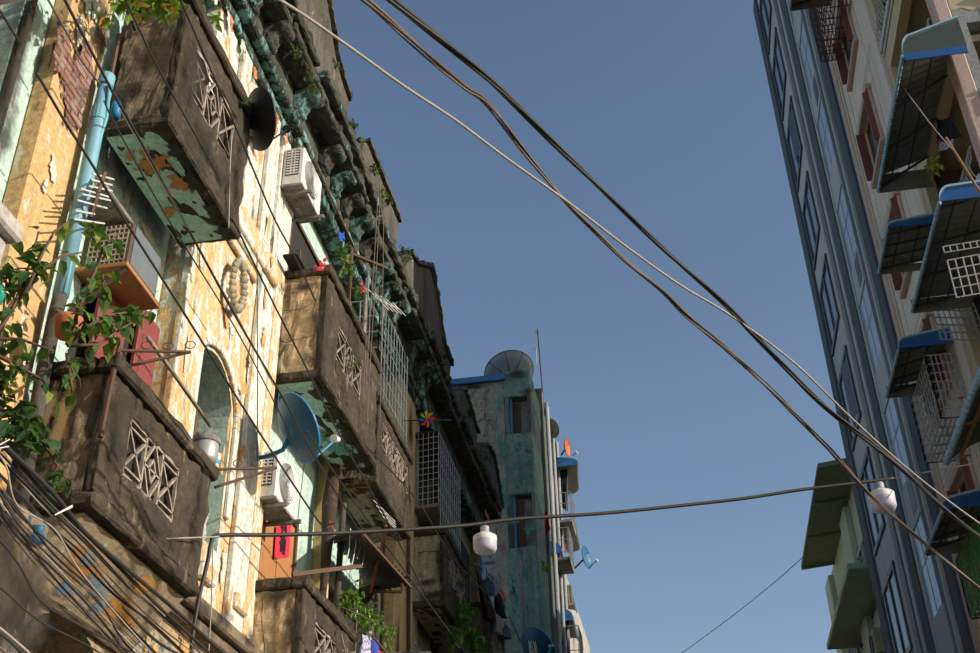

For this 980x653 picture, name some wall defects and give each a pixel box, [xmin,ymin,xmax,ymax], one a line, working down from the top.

spalling [48,0,101,131]
peeling [105,147,189,208]
peeling [183,243,205,375]
peeling [224,274,250,338]
peeling [241,327,266,398]
spalling [458,387,491,422]
peeling [220,409,232,474]
peeling [56,546,157,631]
peeling [220,547,228,591]
peeling [175,626,189,653]